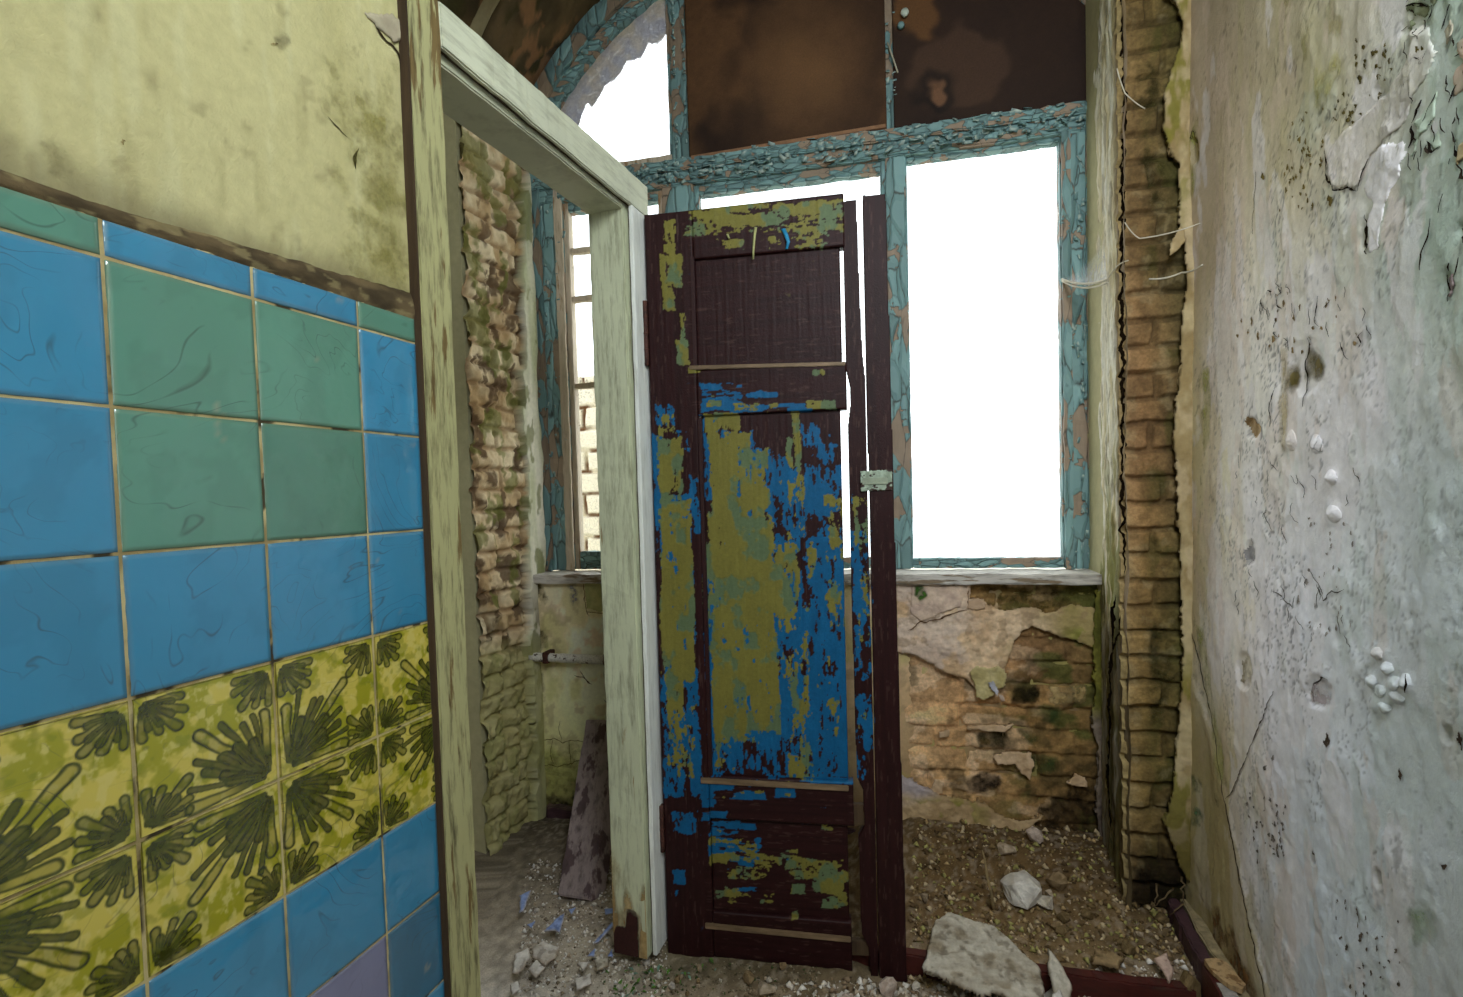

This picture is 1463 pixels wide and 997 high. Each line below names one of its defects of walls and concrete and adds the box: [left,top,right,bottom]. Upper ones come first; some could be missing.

peeling [632,100,1086,185]
peeling [885,44,897,111]
flaking render [1279,0,1463,253]
flaking render [896,0,1198,907]